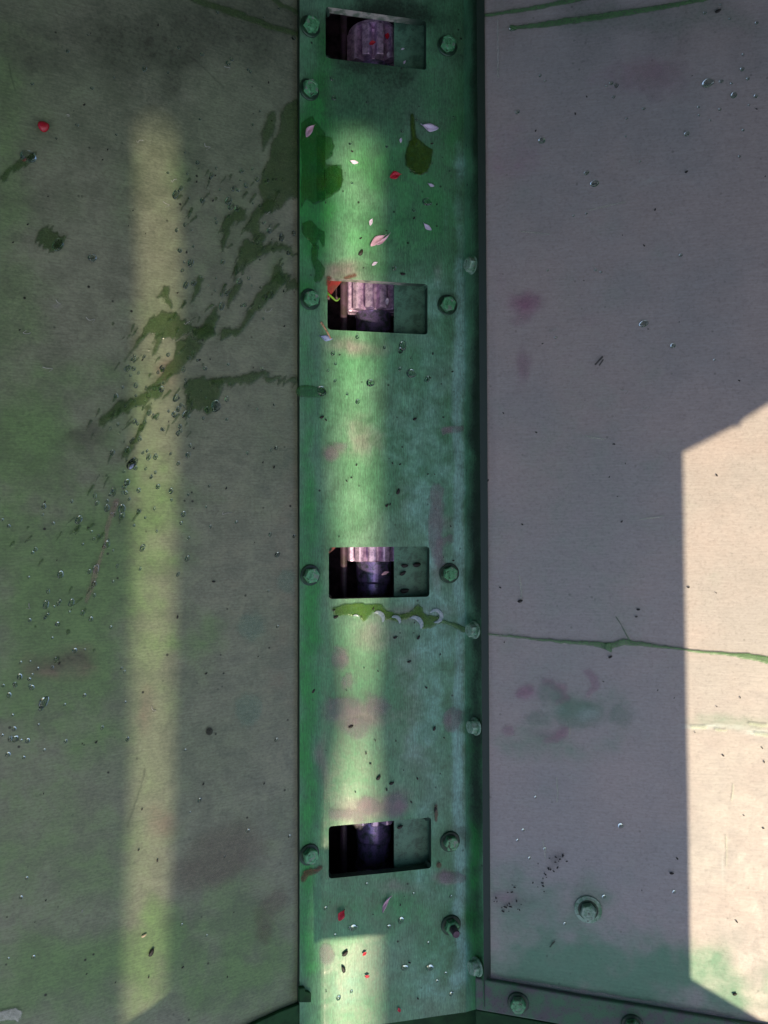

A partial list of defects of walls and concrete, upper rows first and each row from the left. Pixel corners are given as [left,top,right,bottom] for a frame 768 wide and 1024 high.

water stain [88,100,343,462]
water stain [333,603,465,632]